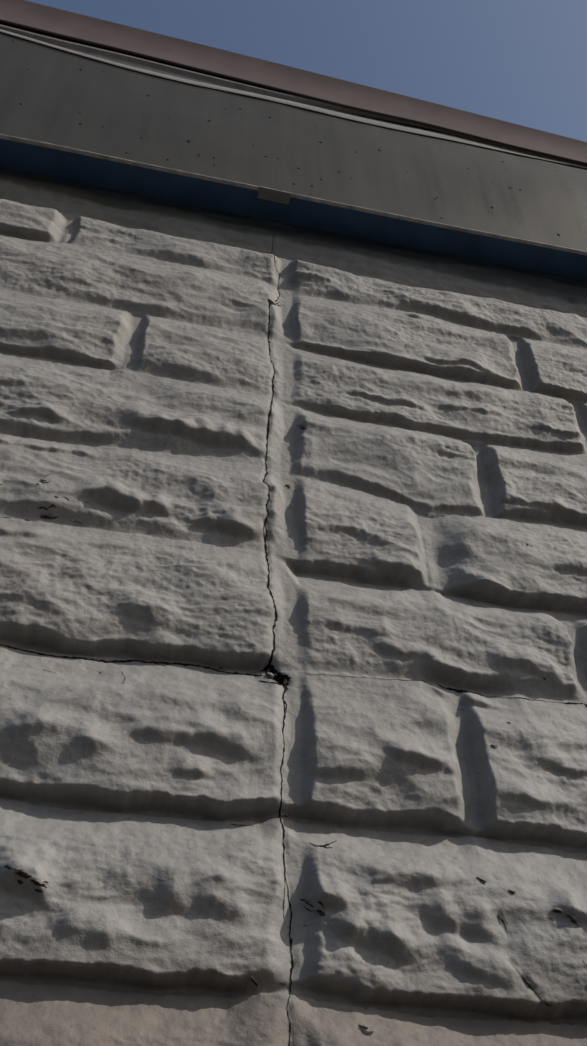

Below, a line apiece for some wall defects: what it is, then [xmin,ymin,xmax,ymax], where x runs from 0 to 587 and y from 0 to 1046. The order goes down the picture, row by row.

crack [0,235,280,676]
crack [279,689,294,1046]
crack [313,674,587,707]